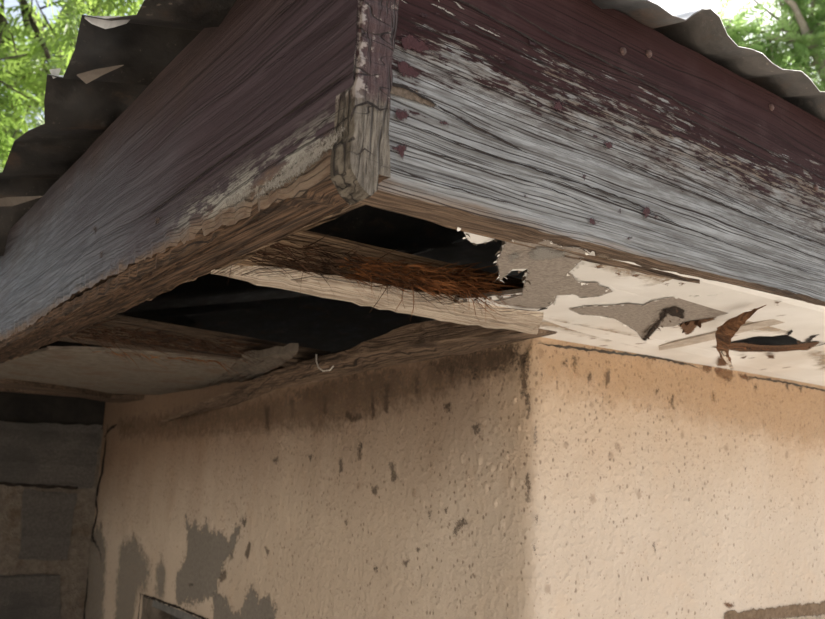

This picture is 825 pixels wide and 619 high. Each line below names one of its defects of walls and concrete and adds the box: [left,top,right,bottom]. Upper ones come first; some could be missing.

peeling [396,27,456,78]
peeling [395,109,409,121]
peeling [453,227,727,341]
leakage [120,345,527,435]
crack [0,424,117,559]
peeling [85,524,106,619]
peeling [115,536,165,619]
peeling [175,514,277,619]